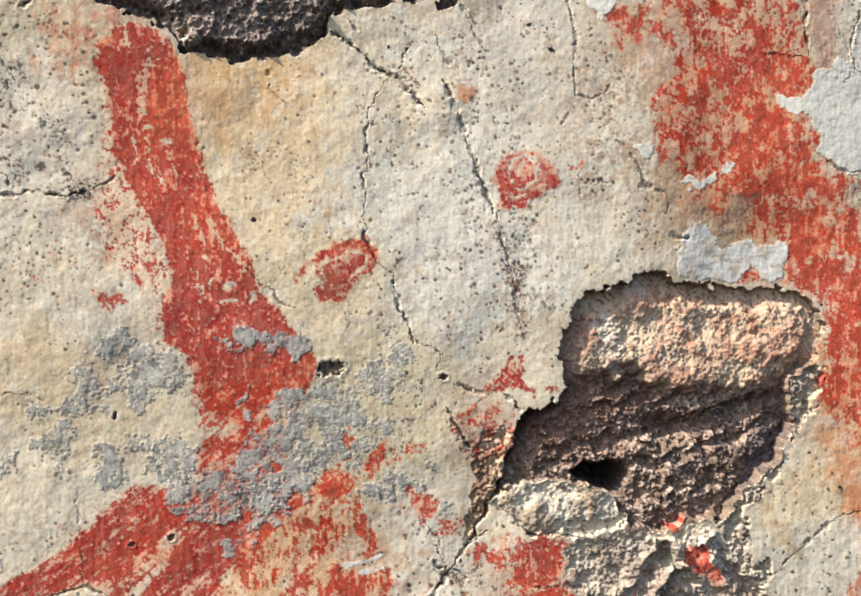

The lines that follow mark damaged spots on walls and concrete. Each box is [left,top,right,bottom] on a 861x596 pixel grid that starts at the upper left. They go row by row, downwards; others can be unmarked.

spalling [94,0,418,65]
spalling [435,0,459,11]
crack [459,3,483,44]
peeling [775,8,861,176]
crack [0,174,116,198]
crack [330,20,441,368]
crack [436,35,525,339]
spalling [0,220,827,596]
crack [444,405,471,448]
crack [457,382,522,411]
crack [423,519,488,596]